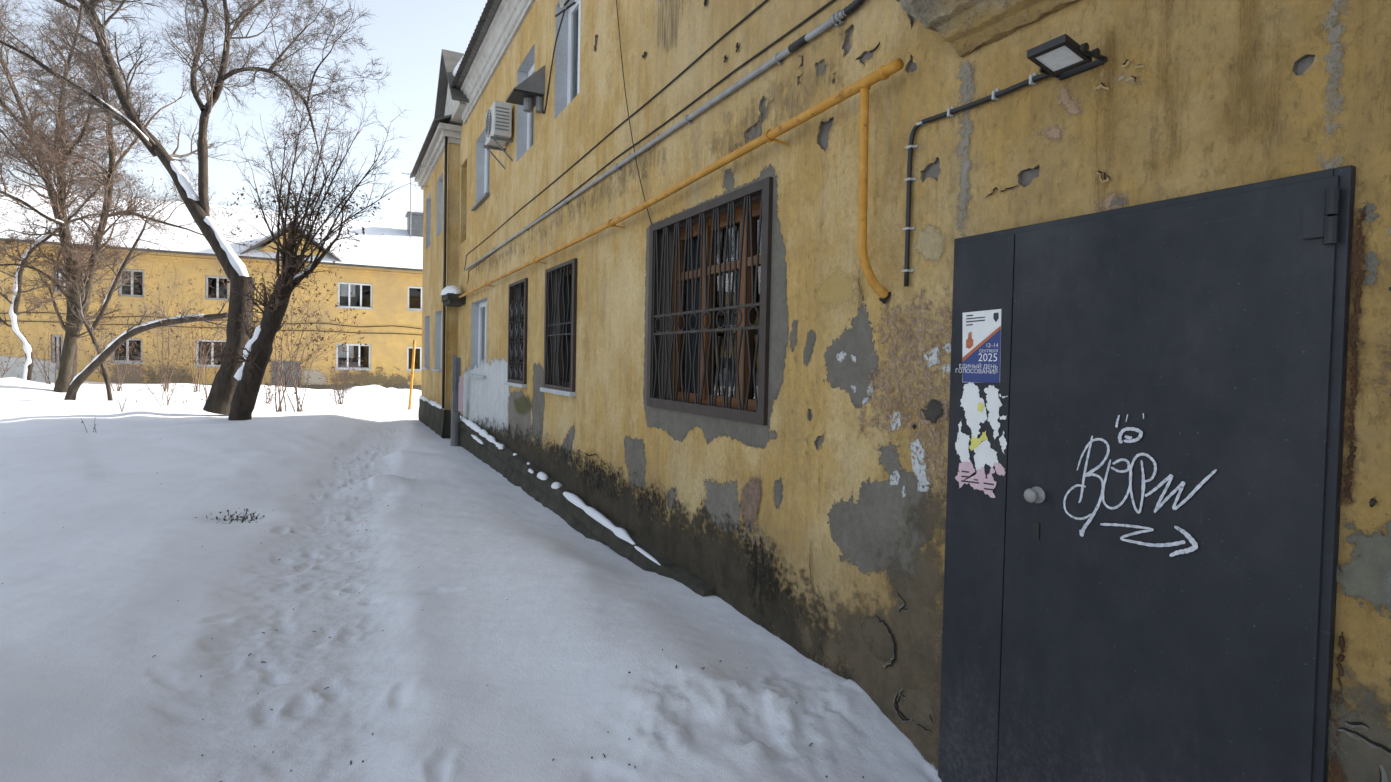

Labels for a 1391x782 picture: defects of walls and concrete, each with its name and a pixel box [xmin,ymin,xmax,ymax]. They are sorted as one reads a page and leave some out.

flaking render [797,24,881,86]
flaking render [744,94,775,144]
flaking render [816,117,835,154]
flaking render [1016,161,1043,190]
peeling [859,289,953,504]
rust [1339,206,1367,505]
peeling [736,477,774,562]
water stain [473,418,946,769]
rust [1330,632,1347,782]
crack [1337,721,1391,782]